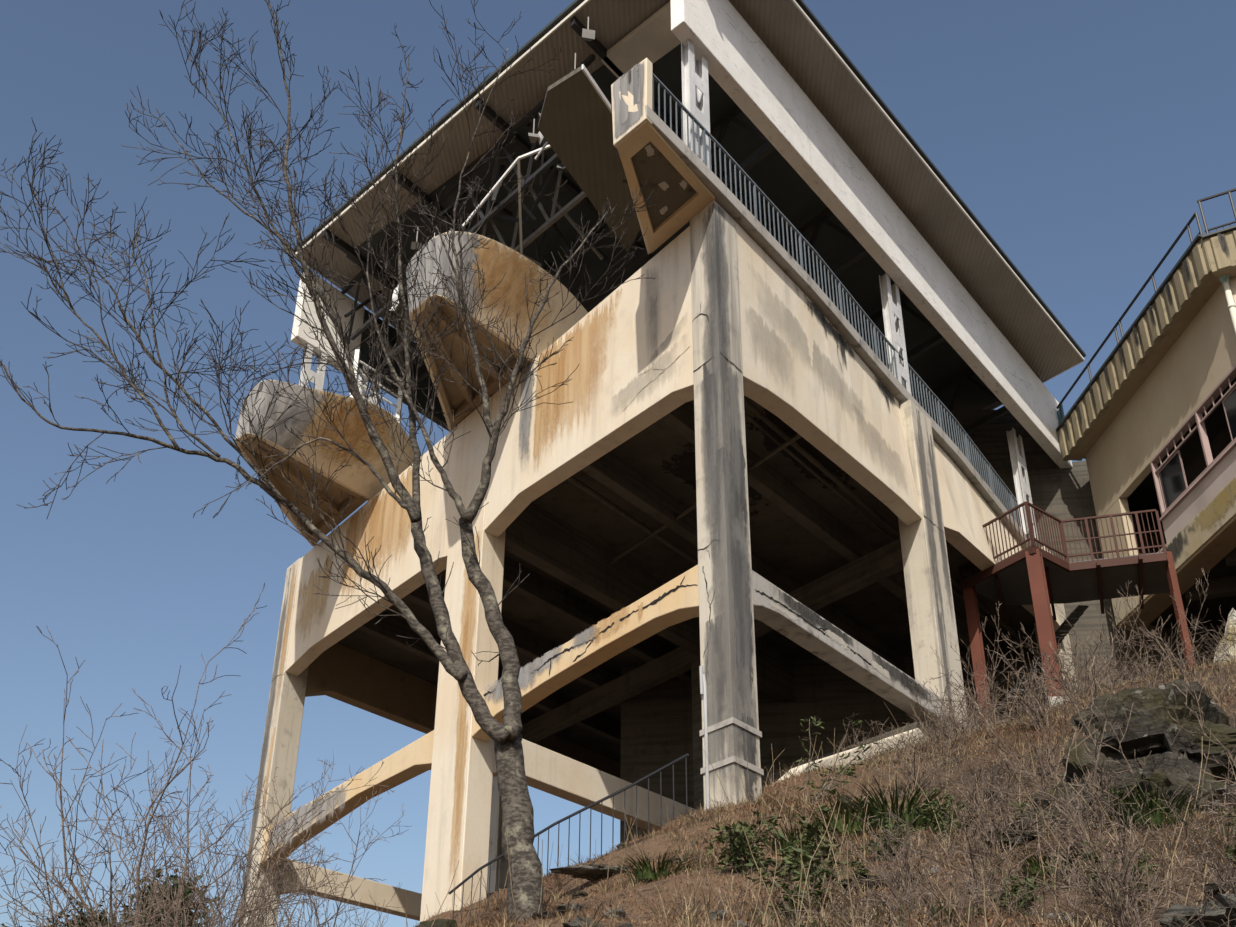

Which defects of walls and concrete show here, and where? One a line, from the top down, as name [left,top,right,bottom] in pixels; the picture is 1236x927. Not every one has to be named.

corrosion [471,235,537,315]
corrosion [312,392,392,459]
corrosion [534,299,612,458]
damp [808,301,854,367]
damp [875,376,895,409]
damp [701,203,755,787]
corrosion [280,467,412,679]
corrosion [460,571,475,668]
crack [531,539,716,675]
crack [755,589,876,669]
corrosion [451,690,467,864]